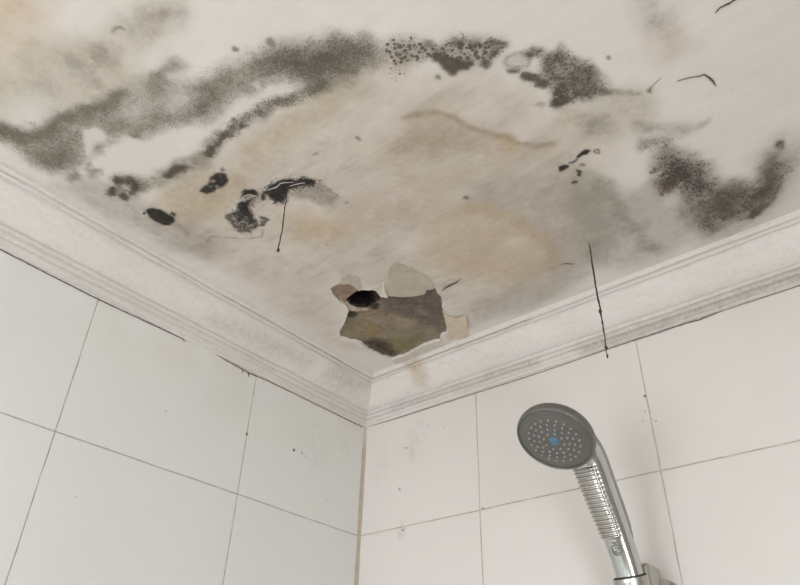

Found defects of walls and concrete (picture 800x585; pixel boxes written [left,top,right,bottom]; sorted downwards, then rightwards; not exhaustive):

leakage [174,34,506,121]
leakage [508,50,607,106]
crack [650,74,716,89]
leakage [0,92,164,167]
leakage [108,93,294,199]
leakage [142,208,176,225]
peeling [225,176,322,232]
leakage [652,152,792,230]
spalling [332,262,468,364]
crack [217,285,800,427]